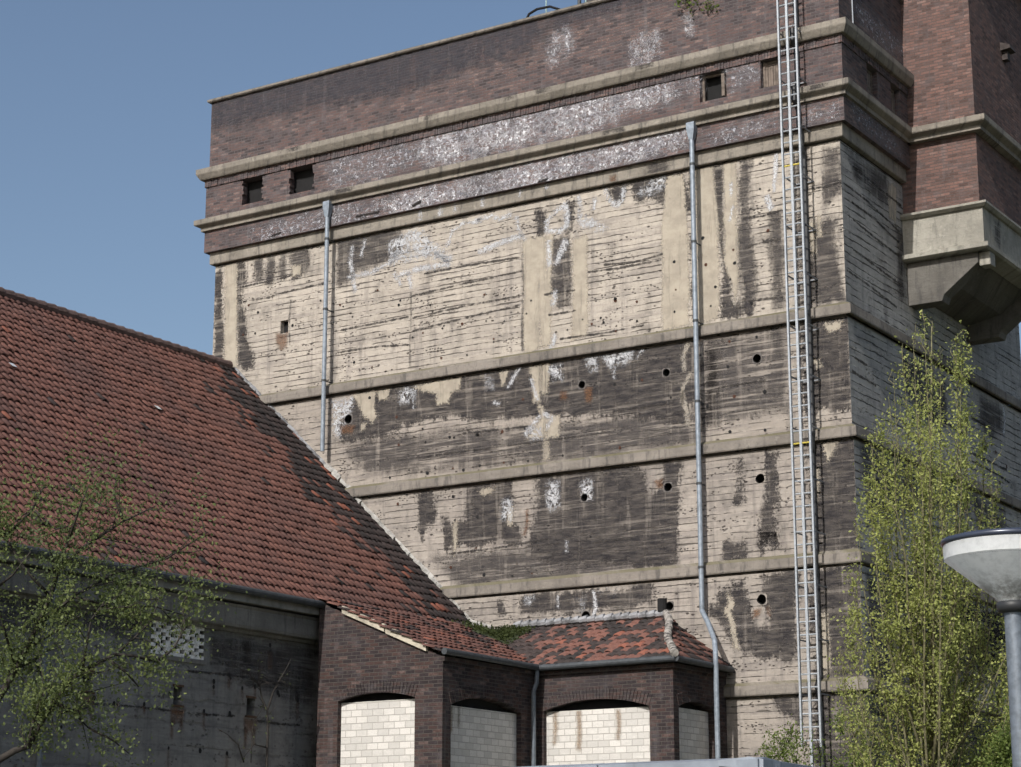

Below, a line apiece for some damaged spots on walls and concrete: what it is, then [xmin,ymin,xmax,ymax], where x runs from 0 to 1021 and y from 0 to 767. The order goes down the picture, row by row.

water stain [259,75,758,353]
water stain [764,153,785,307]
water stain [797,147,846,307]
peeling [353,389,390,430]
peeling [527,363,560,461]
water stain [332,327,789,473]
water stain [800,317,851,417]
water stain [414,460,683,584]
water stain [722,449,786,560]
water stain [519,584,656,616]